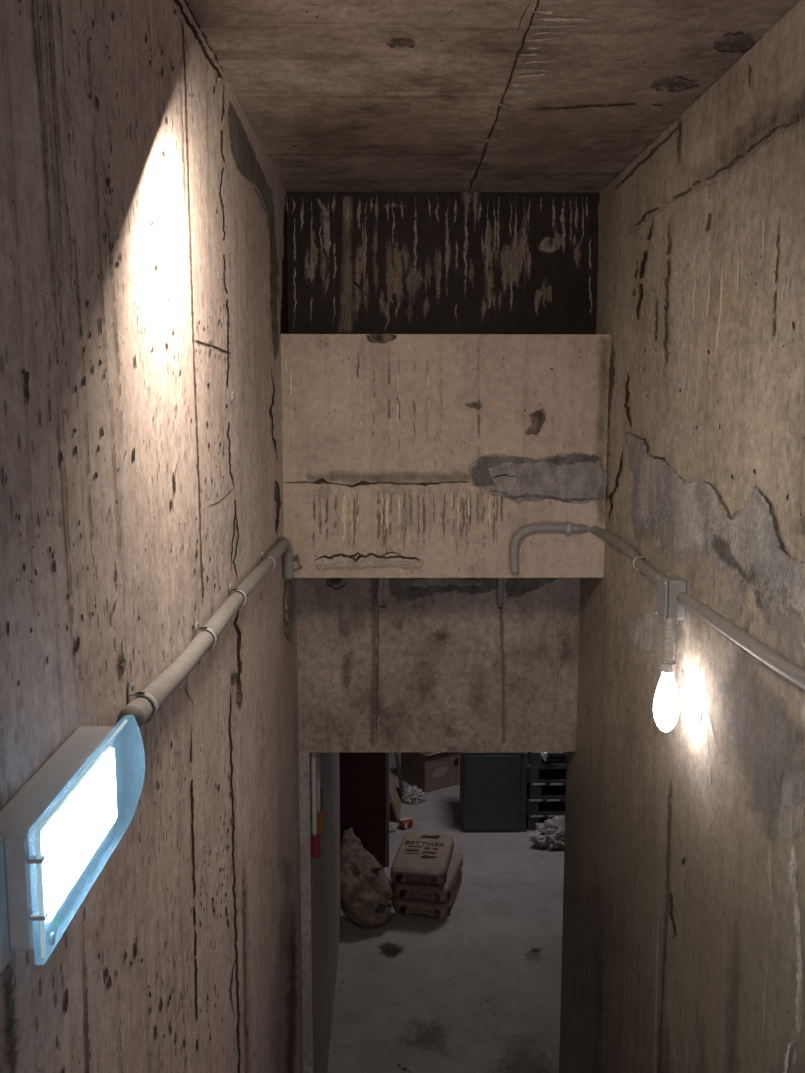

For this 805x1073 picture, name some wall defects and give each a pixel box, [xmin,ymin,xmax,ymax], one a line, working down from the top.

crack [469,0,540,192]
crack [175,0,239,577]
damp [287,197,600,312]
crack [315,551,423,570]
crack [229,609,243,1073]